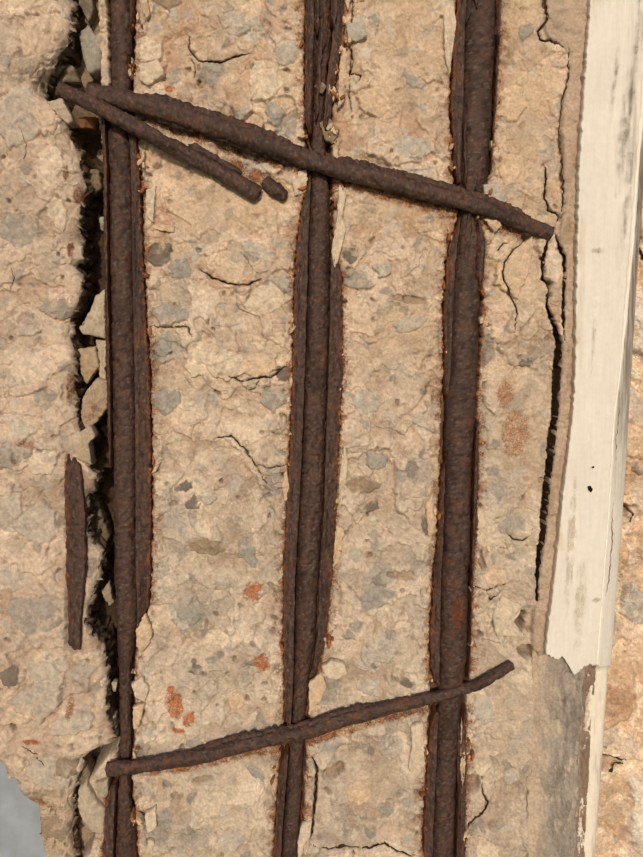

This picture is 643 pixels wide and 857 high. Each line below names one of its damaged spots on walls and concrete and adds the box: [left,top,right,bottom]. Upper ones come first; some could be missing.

rust [144,117,311,185]
rust [295,0,308,143]
rust [282,197,304,476]
spalling [73,0,587,857]
rust [328,176,458,327]
rust [474,217,522,472]
crack [496,0,570,601]
spalling [64,454,88,650]
rust [166,686,194,733]
rust [254,502,287,722]
crack [310,757,418,857]
crack [602,753,627,772]